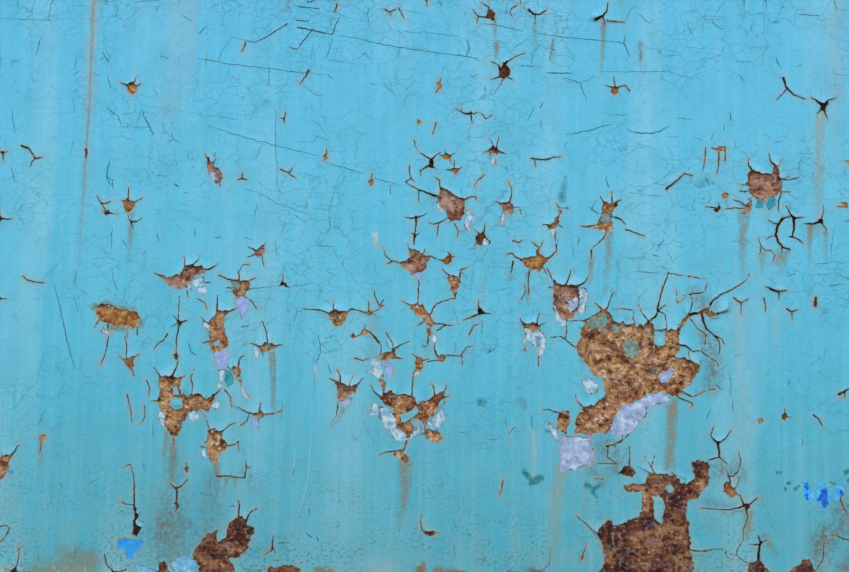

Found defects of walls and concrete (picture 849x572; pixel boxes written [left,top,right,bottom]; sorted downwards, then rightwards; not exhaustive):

crack [201,0,674,97]
crack [207,113,461,307]
crack [406,213,491,256]
peeling [729,155,792,215]
corrosion [93,301,141,359]
peeling [153,256,276,440]
peeling [331,245,463,466]
peeling [510,205,749,473]
crack [117,463,145,560]
corrosion [101,500,301,572]
corrosion [579,401,715,572]
corrosion [748,535,769,572]